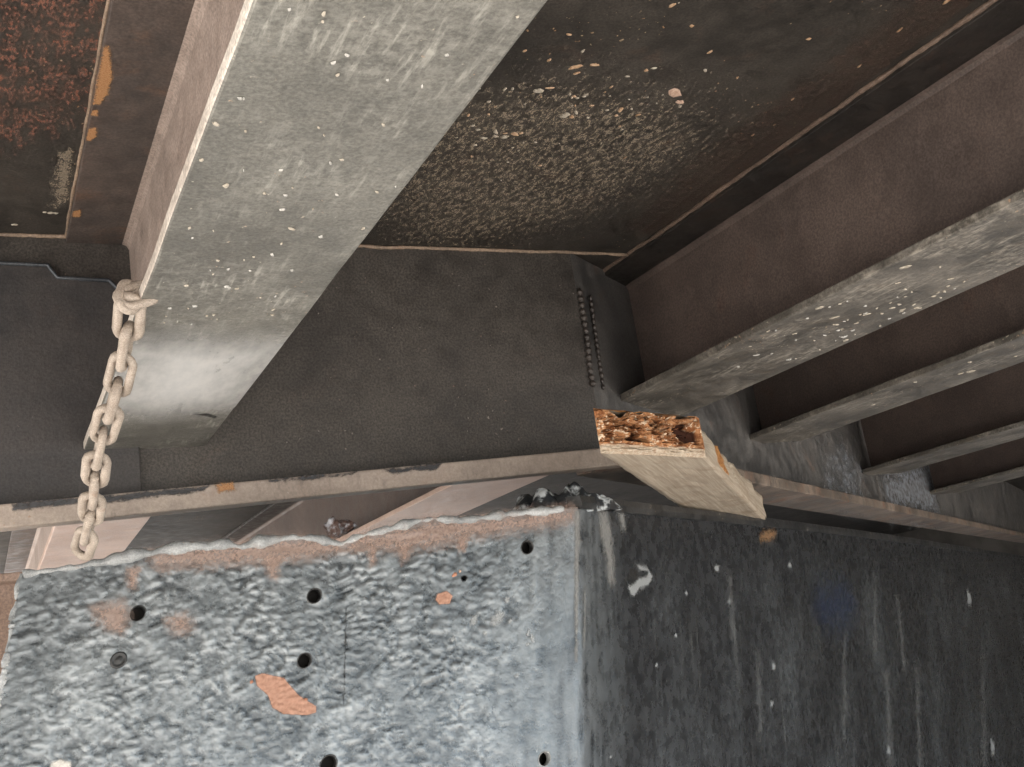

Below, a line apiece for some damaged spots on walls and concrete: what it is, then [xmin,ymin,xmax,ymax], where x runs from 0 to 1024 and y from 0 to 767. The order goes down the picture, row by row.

rust [0,0,112,147]
peeling [436,591,453,604]
peeling [250,673,316,715]